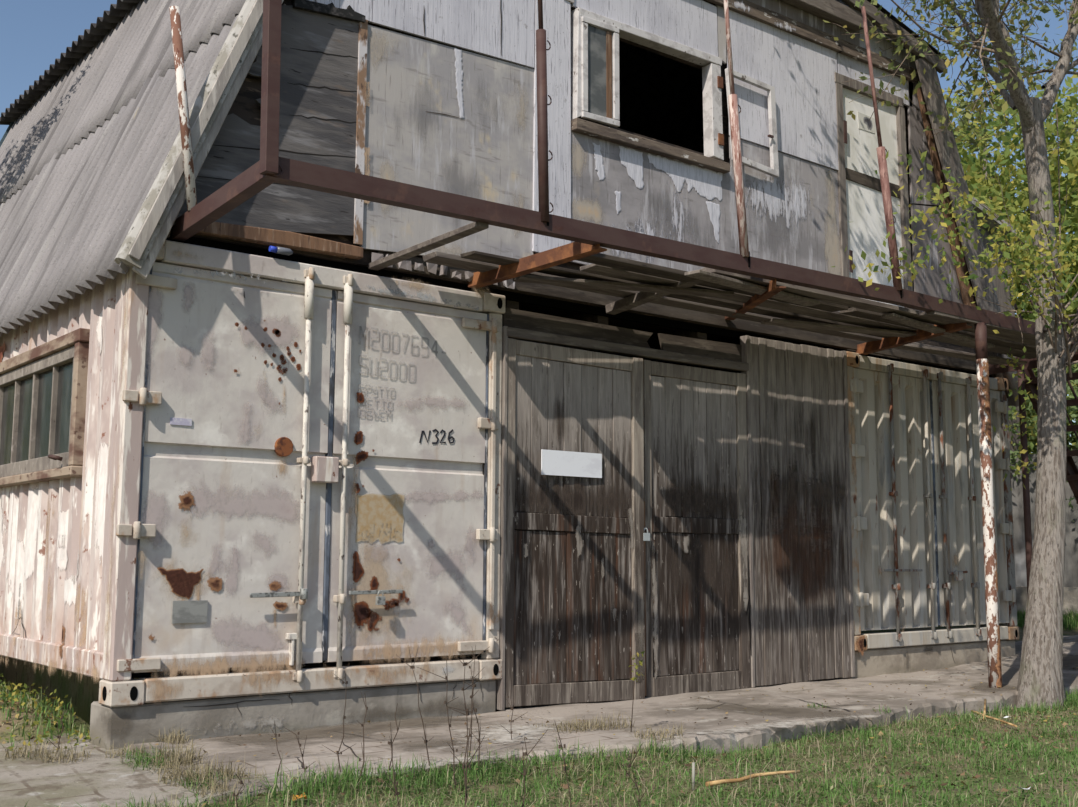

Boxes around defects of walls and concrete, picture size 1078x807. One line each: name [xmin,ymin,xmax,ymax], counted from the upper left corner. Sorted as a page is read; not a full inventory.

peeling [592,143,605,180]
peeling [619,146,723,243]
rust [261,320,301,404]
peeling [0,488,39,621]
peeling [56,508,79,606]
peeling [94,442,108,567]
rust [178,491,196,511]
rust [157,565,223,600]
rust [269,581,288,625]
rust [349,431,473,678]
leakage [515,475,630,517]
leakage [765,418,844,604]